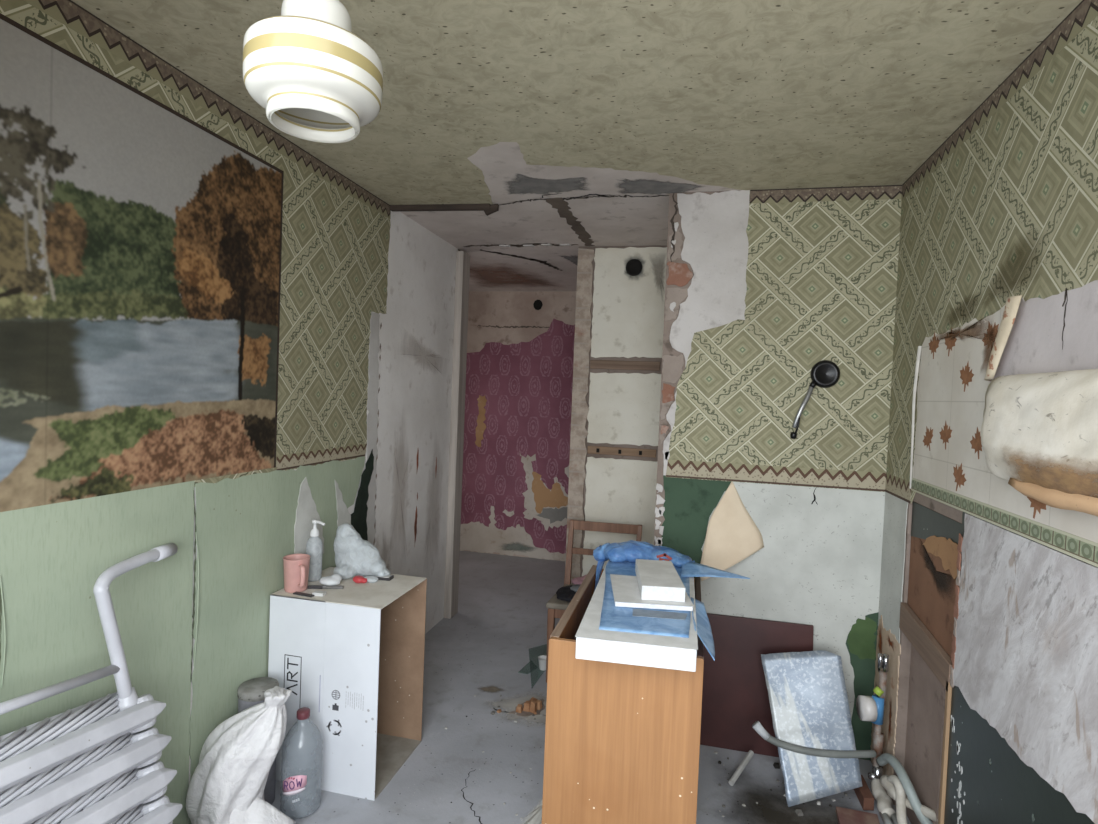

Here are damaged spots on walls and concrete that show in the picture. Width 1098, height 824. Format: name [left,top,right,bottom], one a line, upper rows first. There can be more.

flaking render [654,190,750,546]
flaking render [994,280,1098,379]
crack [0,576,8,687]
crack [191,497,199,676]
peeling [923,513,1098,824]
crack [461,769,482,824]